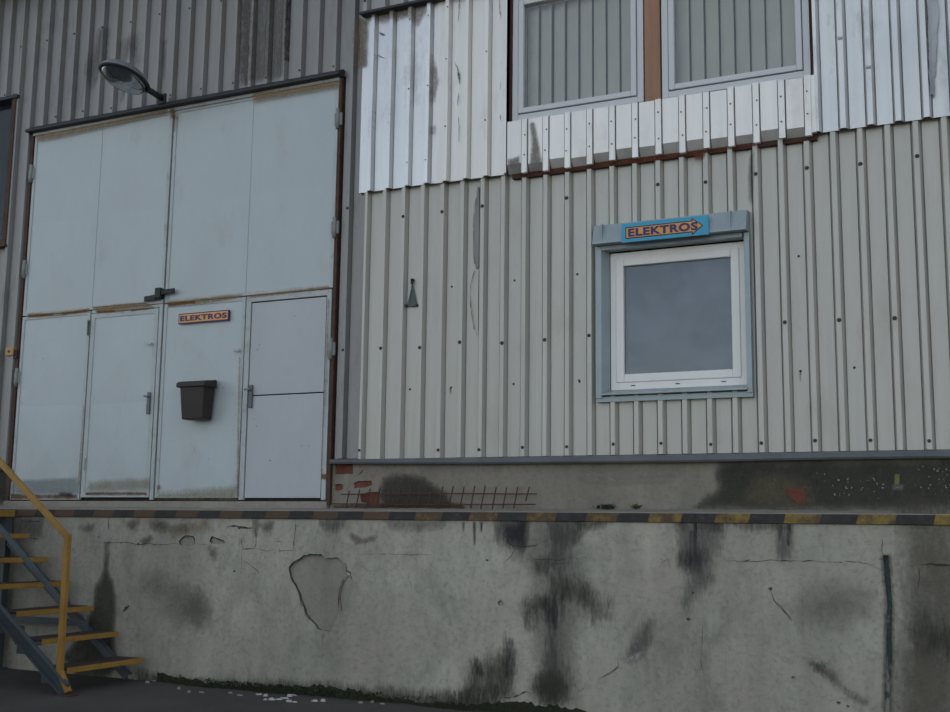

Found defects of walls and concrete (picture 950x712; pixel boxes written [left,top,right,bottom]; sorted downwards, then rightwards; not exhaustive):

leakage [240,0,291,85]
flaking render [334,464,380,504]
leakage [699,460,950,513]
peeling [289,553,354,631]
leakage [526,522,601,703]
crack [733,540,883,570]
leakage [902,525,950,712]